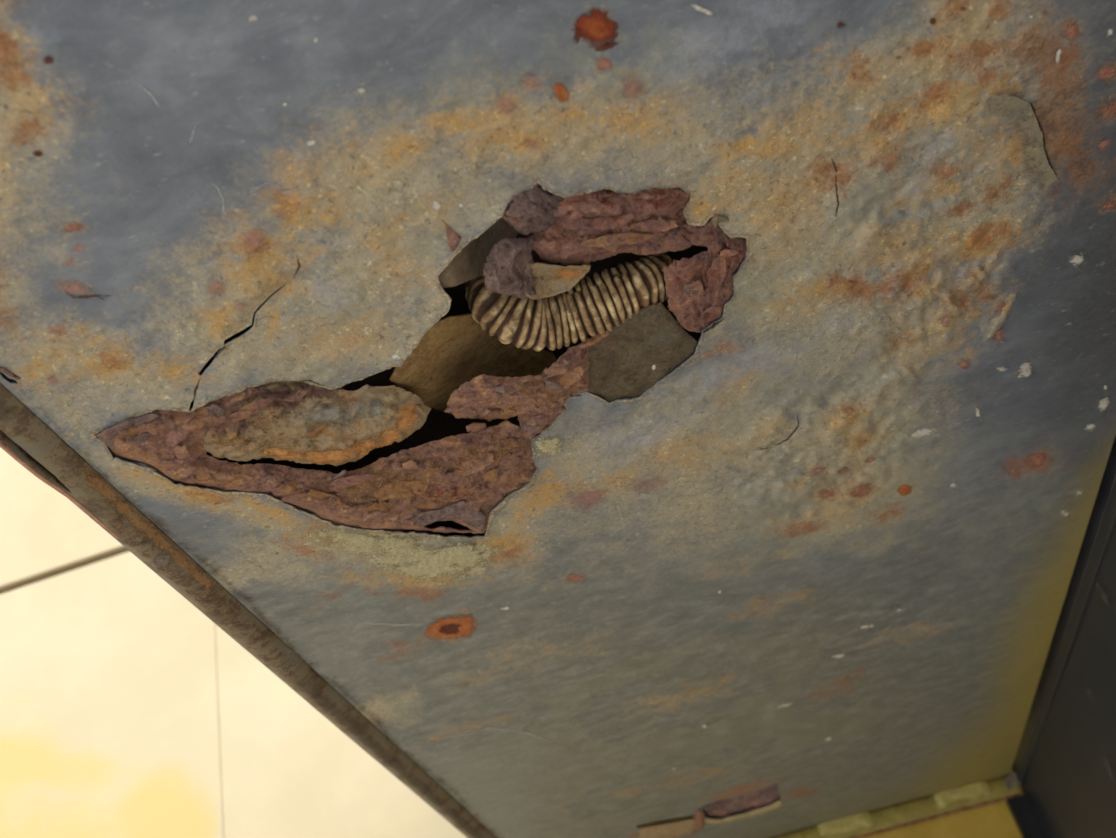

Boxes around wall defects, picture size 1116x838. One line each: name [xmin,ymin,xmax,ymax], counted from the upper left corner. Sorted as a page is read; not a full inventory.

peeling [432,201,462,252]
peeling [563,216,678,248]
crack [214,255,300,358]
rust [0,0,1116,664]
peeling [690,256,727,308]
peeling [638,819,696,838]